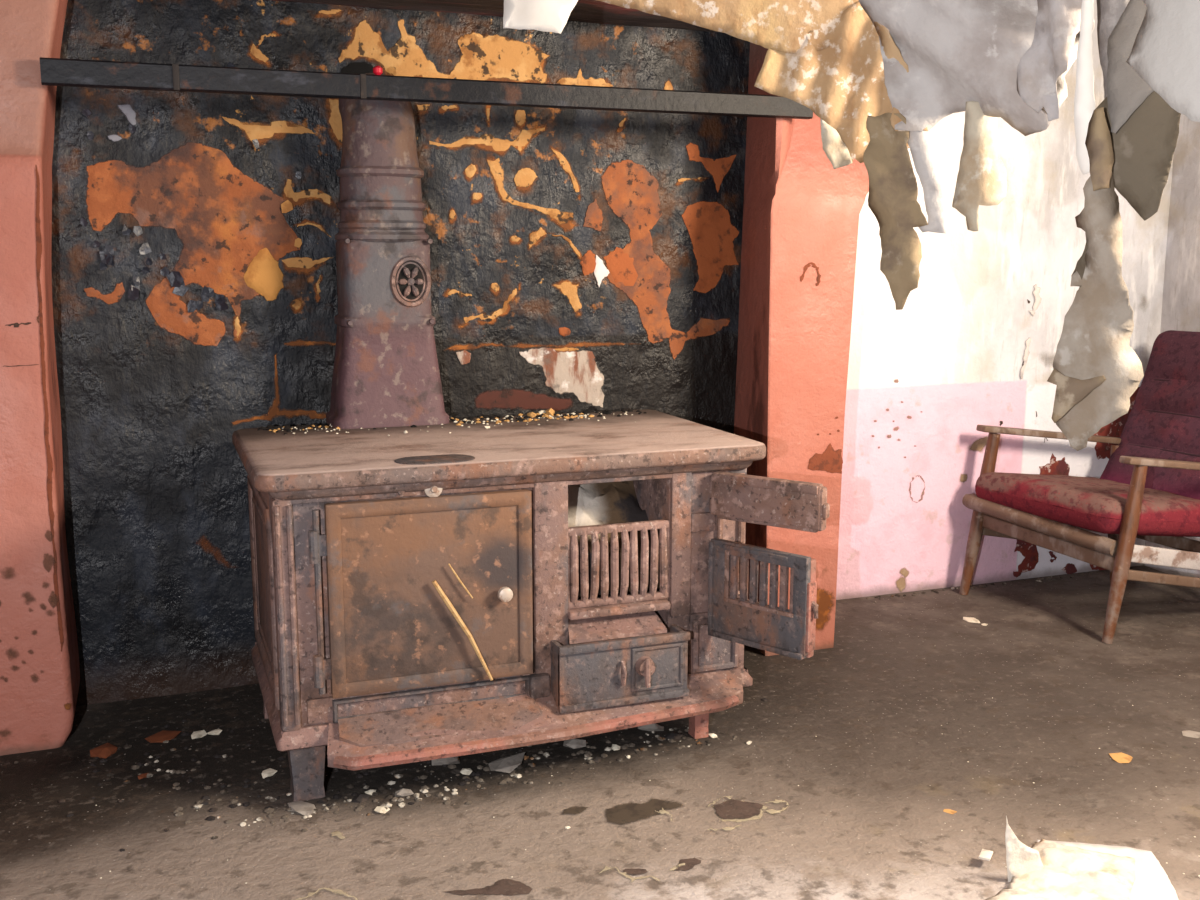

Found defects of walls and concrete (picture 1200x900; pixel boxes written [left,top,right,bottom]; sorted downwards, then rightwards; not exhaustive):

peeling [338,19,613,87]
peeling [416,104,460,115]
peeling [80,142,335,346]
peeling [429,105,739,359]
spalling [456,350,471,365]
spalling [475,327,604,418]
peeling [1094,387,1140,460]
peeling [1039,453,1070,476]
peeling [1013,539,1107,577]